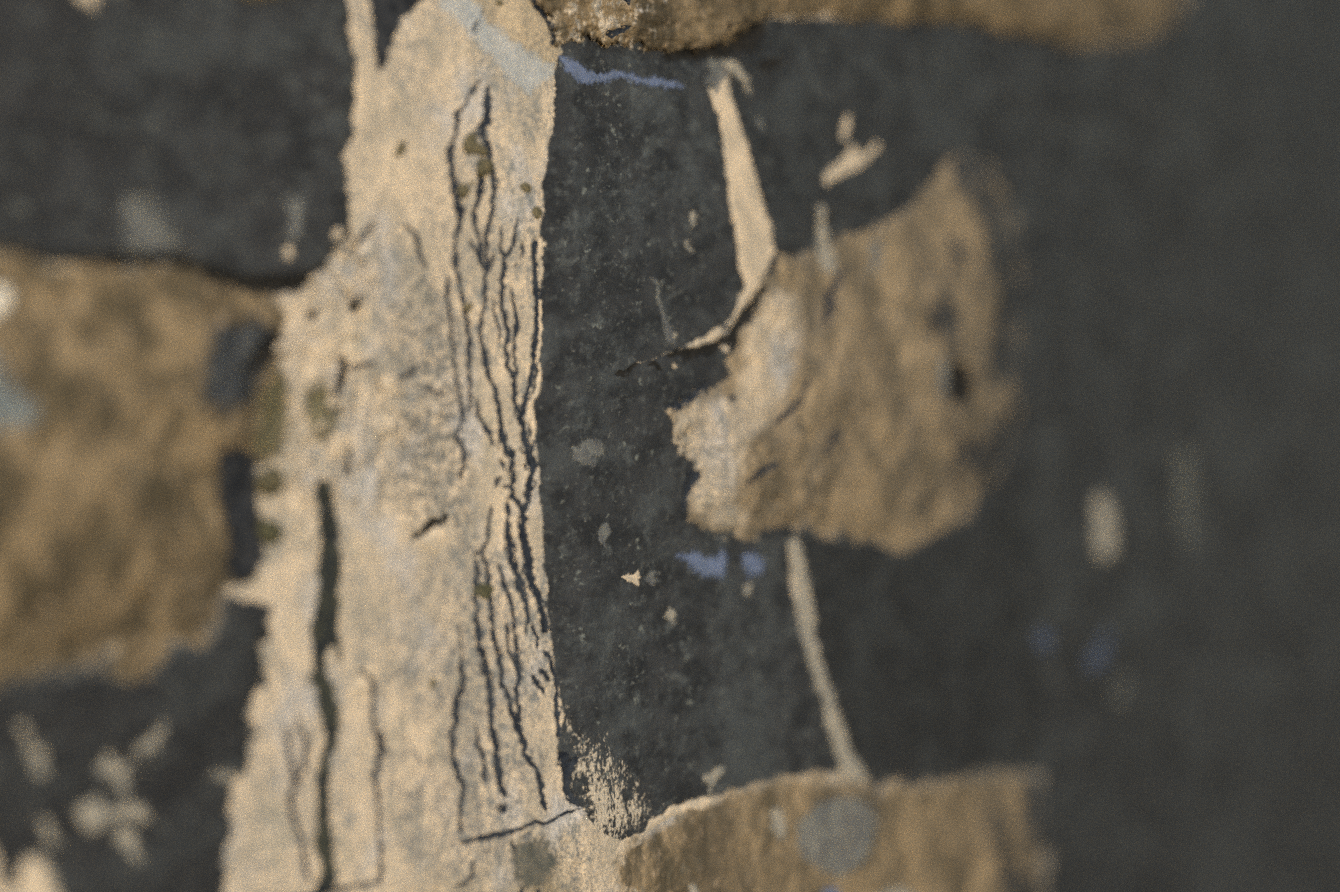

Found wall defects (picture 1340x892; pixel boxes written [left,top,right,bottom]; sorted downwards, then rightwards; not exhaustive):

peeling [652,58,775,348]
peeling [536,237,546,280]
peeling [526,300,543,444]
crack [0,78,582,892]
peeling [572,439,603,466]
peeling [598,523,611,547]
peeling [621,570,656,586]
peeling [74,719,167,865]
peeling [644,766,727,833]